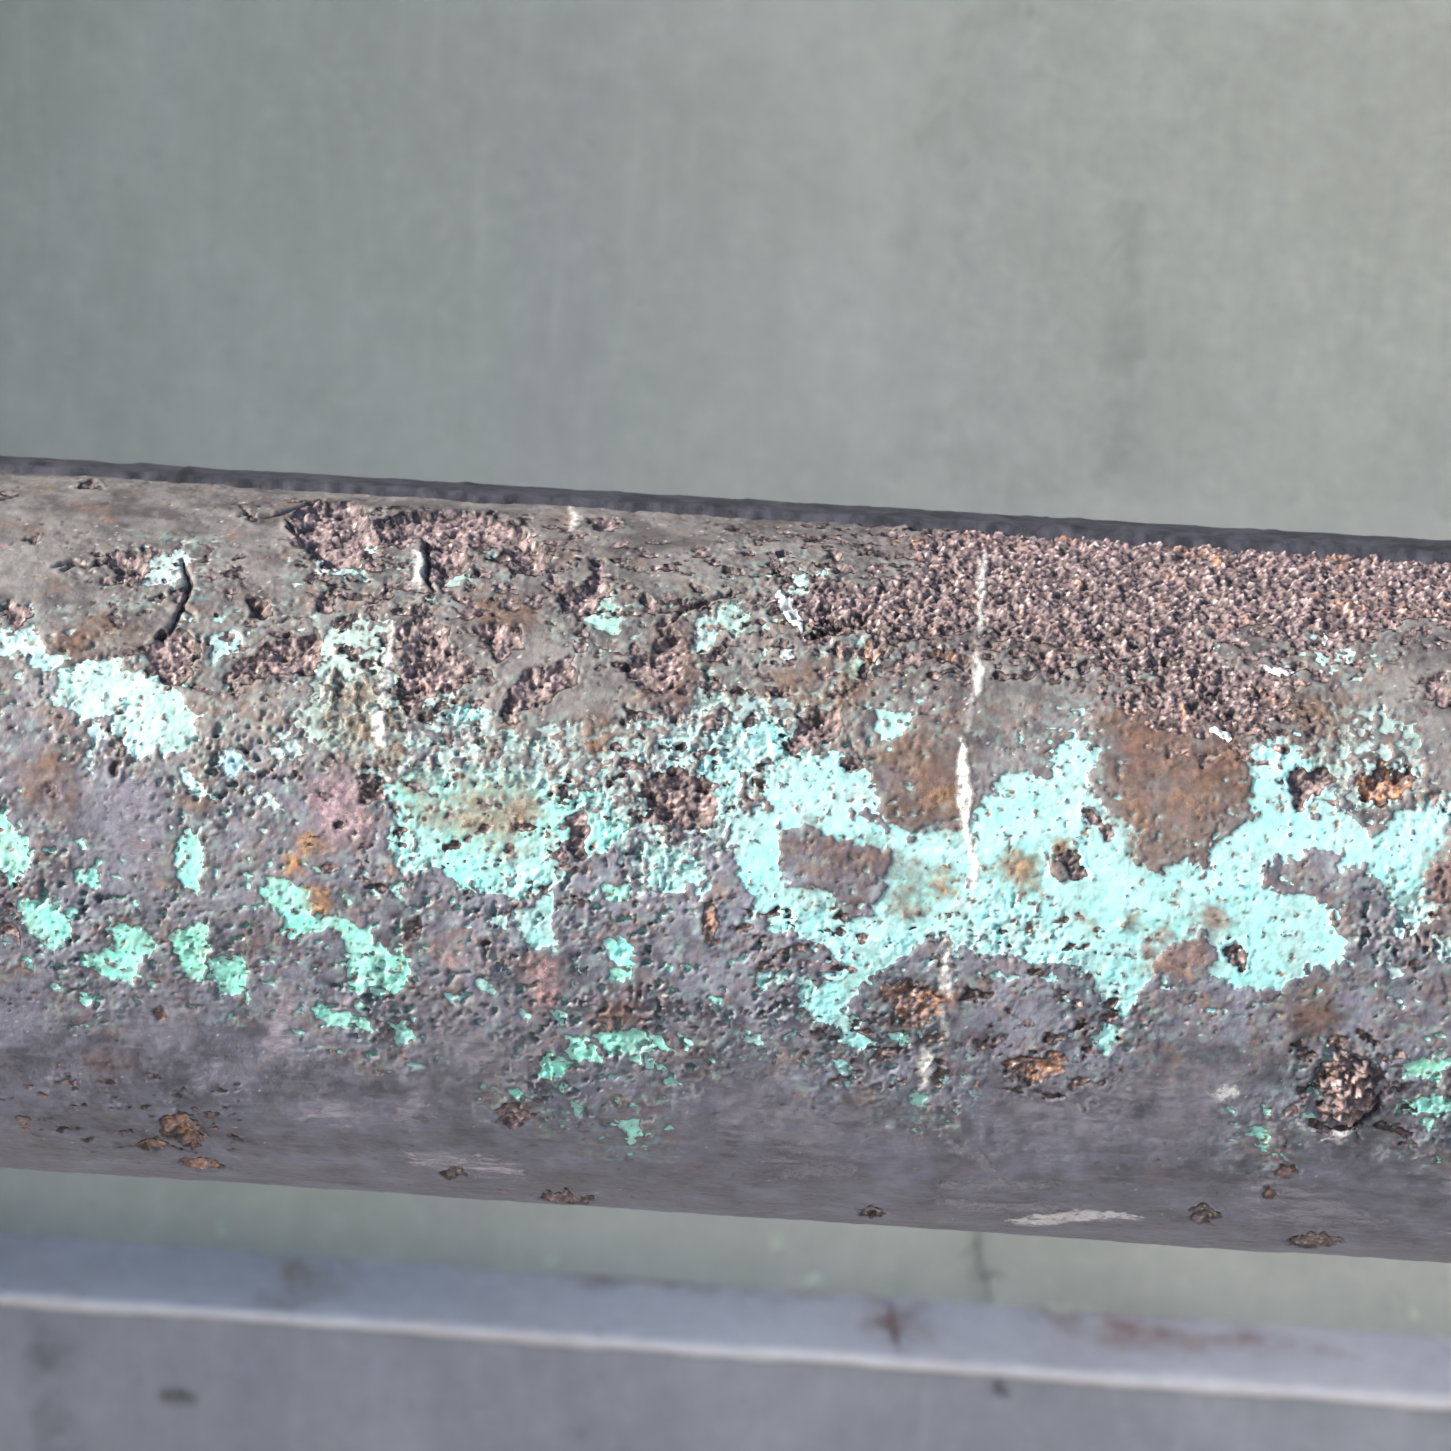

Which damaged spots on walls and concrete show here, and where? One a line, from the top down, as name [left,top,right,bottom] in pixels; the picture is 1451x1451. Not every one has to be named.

rust [62,542,316,701]
rust [280,498,1345,893]
rust [0,871,43,953]
rust [522,958,557,1006]
rust [528,879,591,903]
rust [728,896,1124,1100]
rust [885,859,994,1017]
rust [997,907,1227,978]
rust [1426,853,1451,915]
rust [0,1064,94,1143]
rust [98,1065,243,1152]
rust [1283,1028,1417,1149]